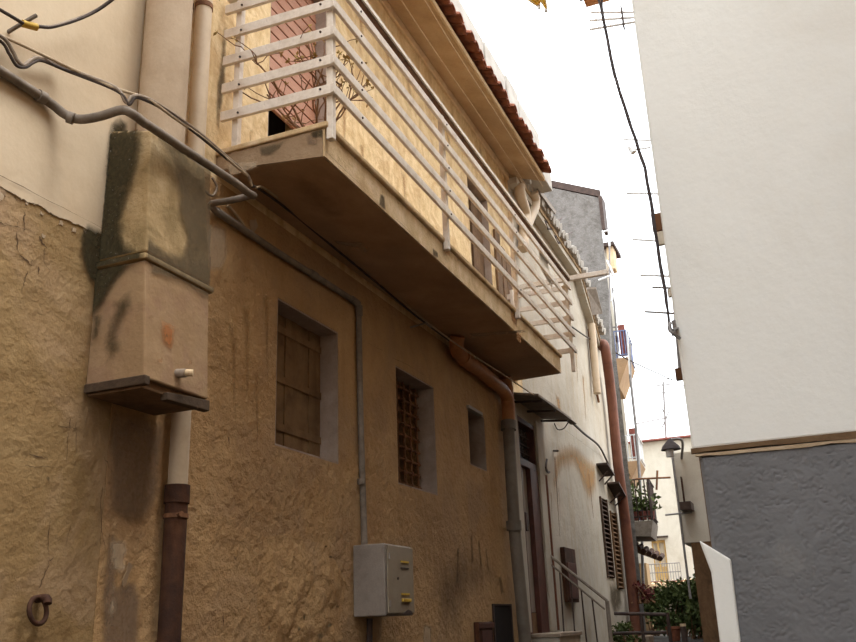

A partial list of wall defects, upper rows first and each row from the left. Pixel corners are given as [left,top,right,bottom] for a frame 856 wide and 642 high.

crack [0,194,50,286]
leakage [83,121,214,338]